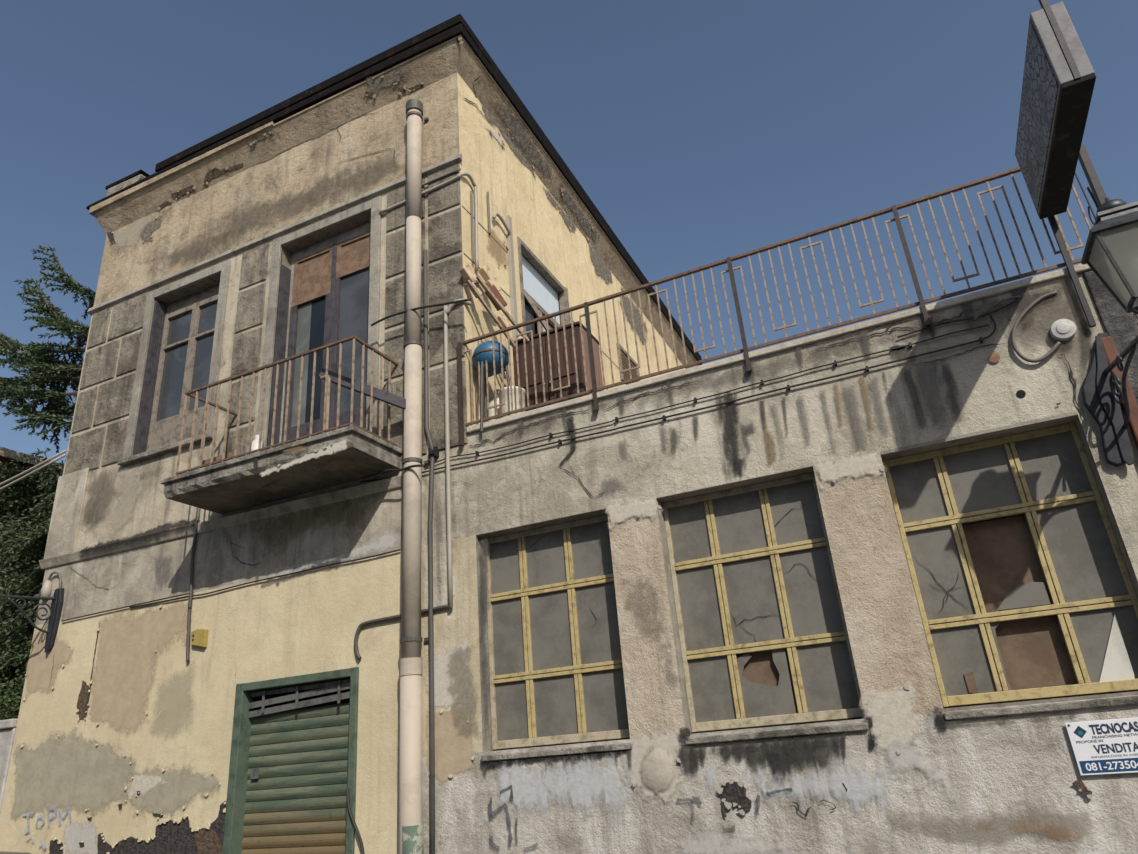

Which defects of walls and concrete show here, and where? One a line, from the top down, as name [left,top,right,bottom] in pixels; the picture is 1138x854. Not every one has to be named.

water stain [890,345,962,426]
water stain [661,428,677,452]
water stain [718,393,754,476]
water stain [797,396,810,440]
water stain [845,387,865,444]
crack [557,449,605,498]
water stain [268,532,396,581]
spalling [76,681,91,720]
peeling [426,642,475,783]
water stain [866,717,875,750]
water stain [679,727,948,811]
spalling [47,762,226,854]